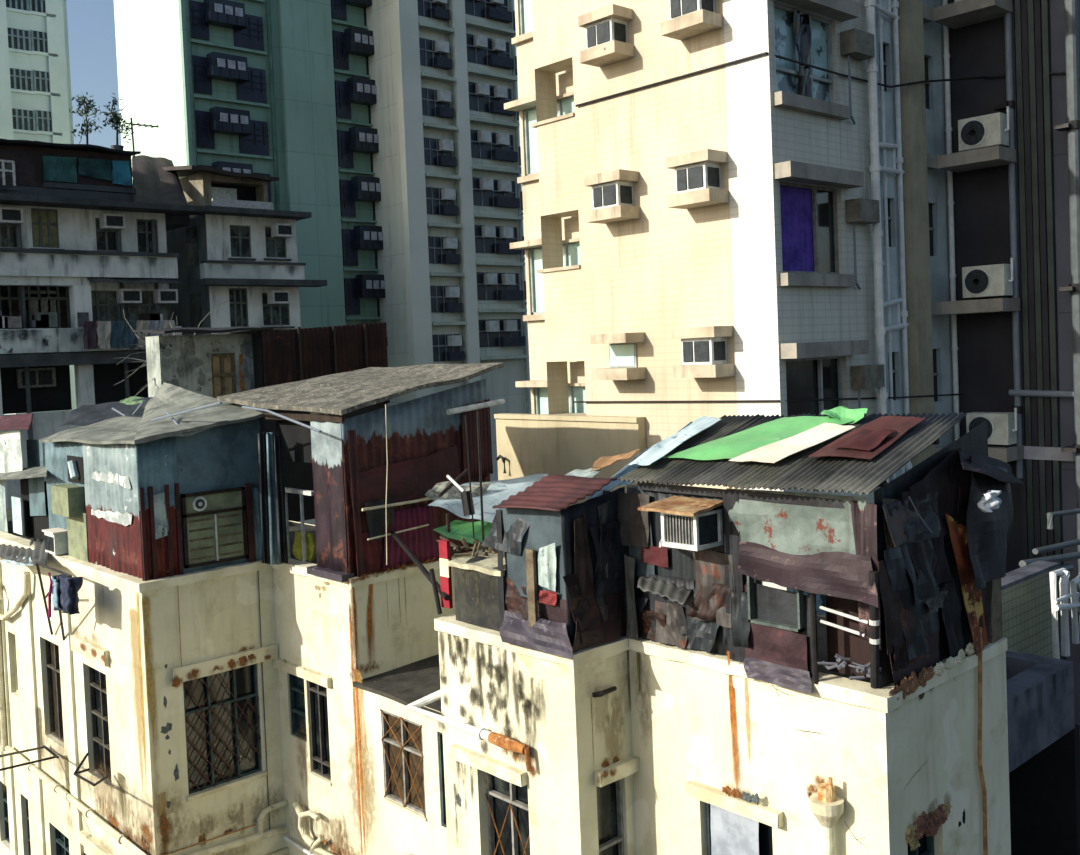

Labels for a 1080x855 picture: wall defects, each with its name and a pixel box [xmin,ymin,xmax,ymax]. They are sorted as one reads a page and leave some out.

corrosion [136,594,156,752]
corrosion [172,669,199,687]
corrosion [213,647,271,671]
corrosion [320,558,436,855]
damp [440,632,544,756]
corrosion [727,651,739,781]
corrosion [807,776,824,798]